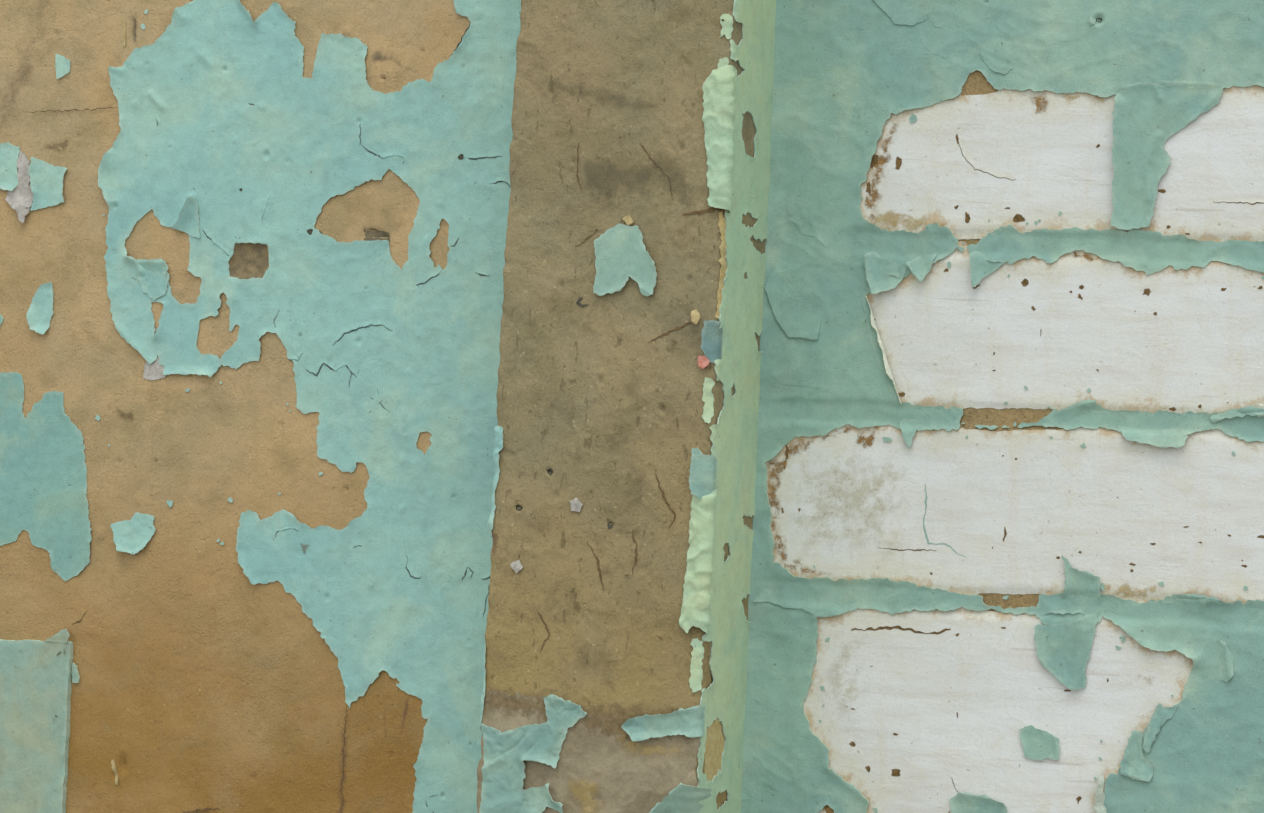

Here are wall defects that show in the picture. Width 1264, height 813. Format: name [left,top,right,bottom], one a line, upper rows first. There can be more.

peeling [55,54,71,80]
peeling [0,142,67,223]
crack [463,151,510,186]
crack [956,134,1017,180]
crack [415,238,459,285]
peeling [26,282,54,335]
crack [289,319,394,413]
peeling [98,0,777,813]
peeling [765,70,1264,813]
peeling [0,372,92,581]
crack [462,567,491,616]
crack [851,625,951,635]